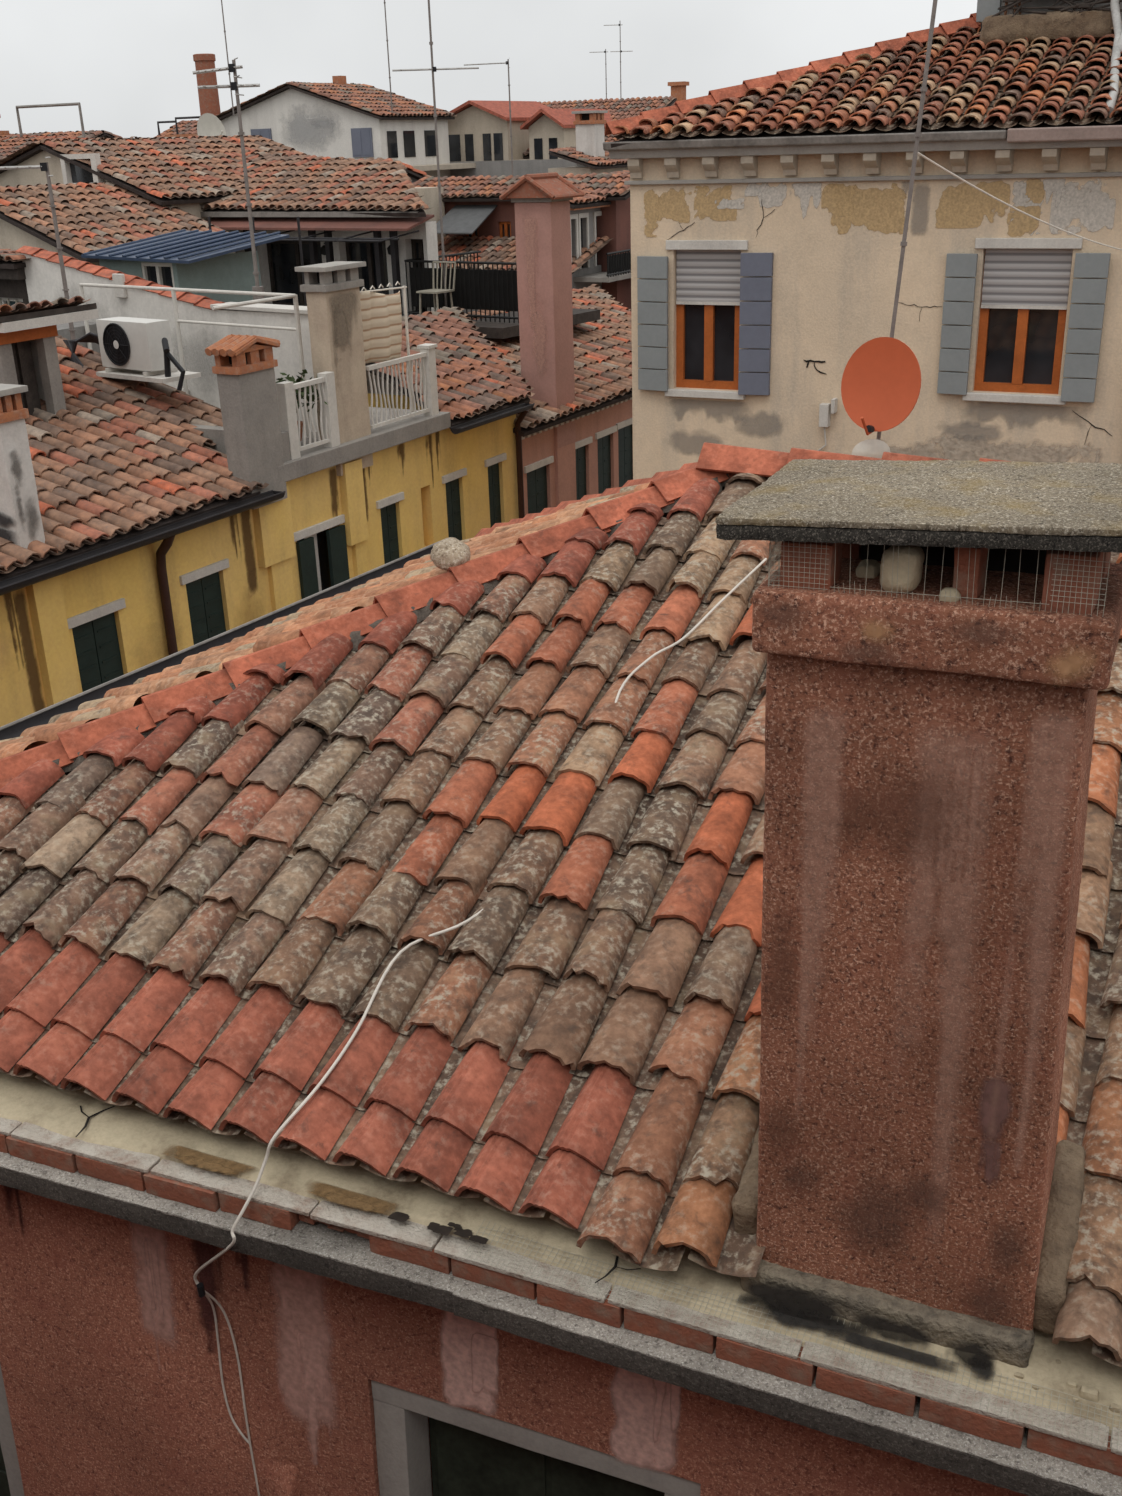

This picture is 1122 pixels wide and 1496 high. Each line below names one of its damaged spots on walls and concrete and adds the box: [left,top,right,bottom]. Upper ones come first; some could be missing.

peeling [644,183,906,237]
peeling [936,179,1116,237]
water stain [0,513,13,542]